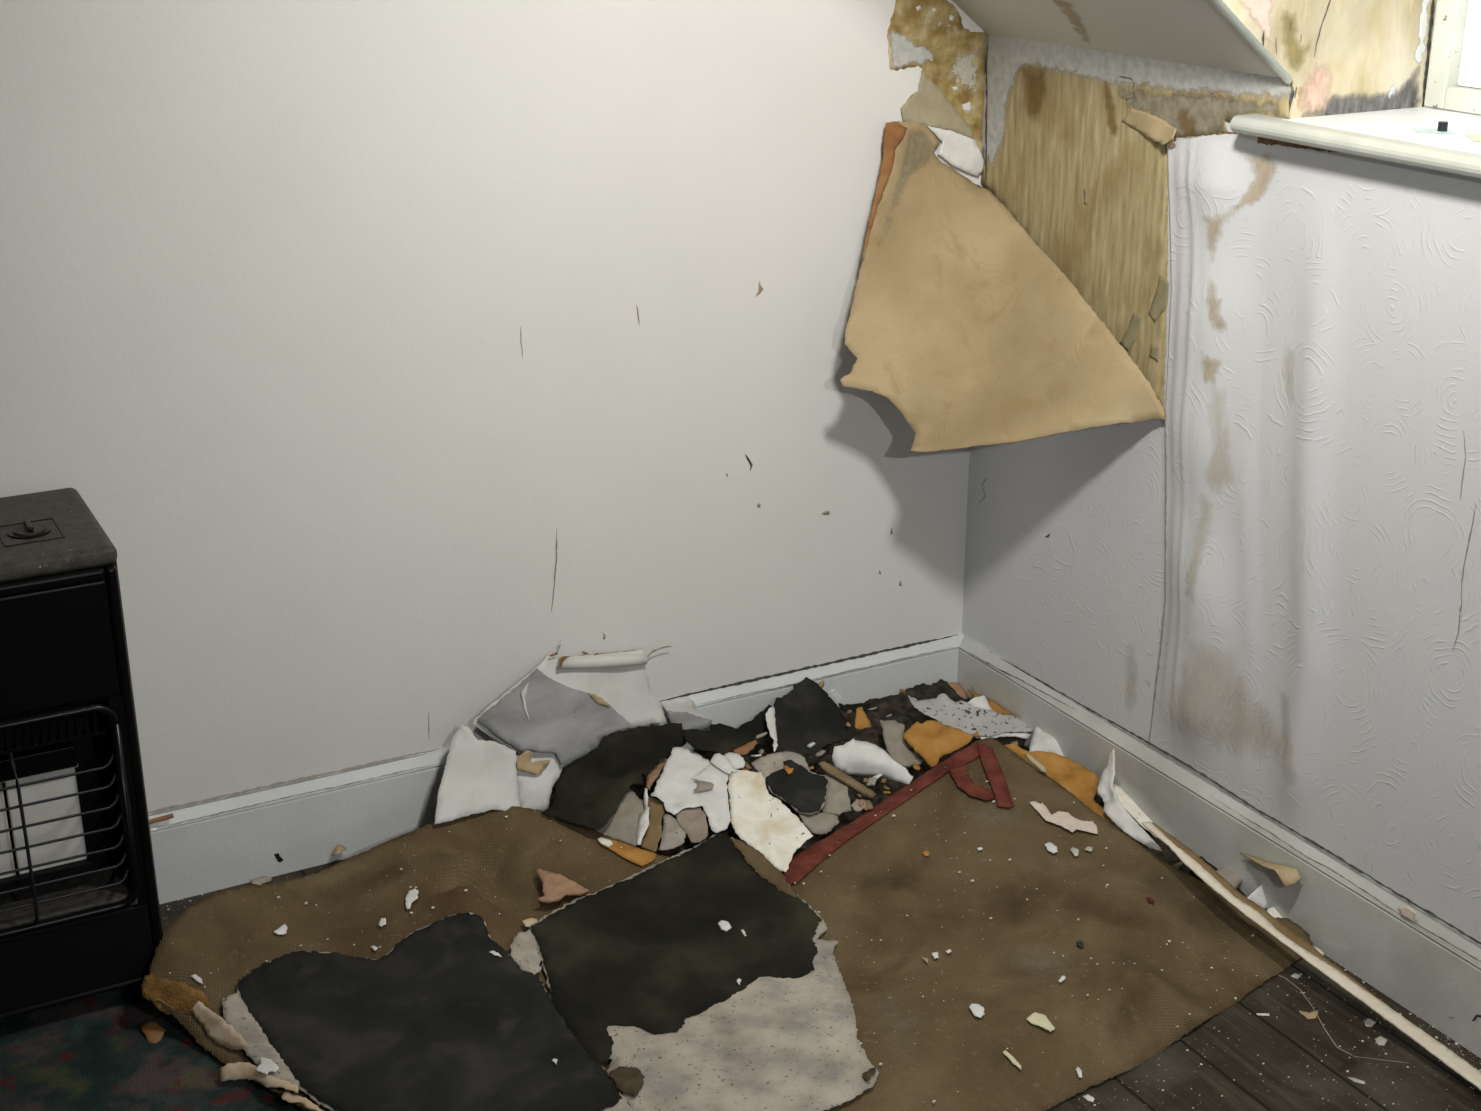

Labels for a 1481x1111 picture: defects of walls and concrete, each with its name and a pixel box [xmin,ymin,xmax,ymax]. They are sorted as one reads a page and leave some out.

peeling [1415,0,1430,63]
peeling [887,0,1337,407]
damp [1237,158,1274,208]